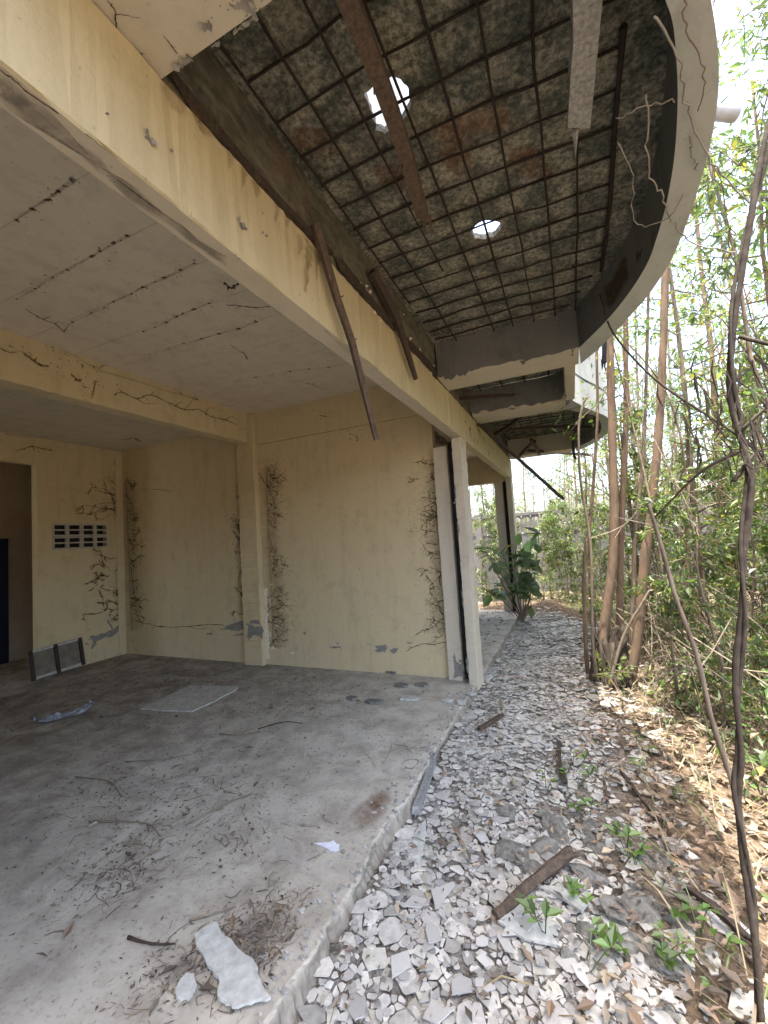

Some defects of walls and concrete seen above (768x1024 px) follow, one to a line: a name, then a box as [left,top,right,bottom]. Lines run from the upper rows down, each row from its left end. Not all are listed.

peeling [173,54,194,72]
spalling [199,0,628,441]
crack [223,282,271,309]
peeling [85,620,119,649]
peeling [207,584,279,662]
peeling [367,642,413,655]